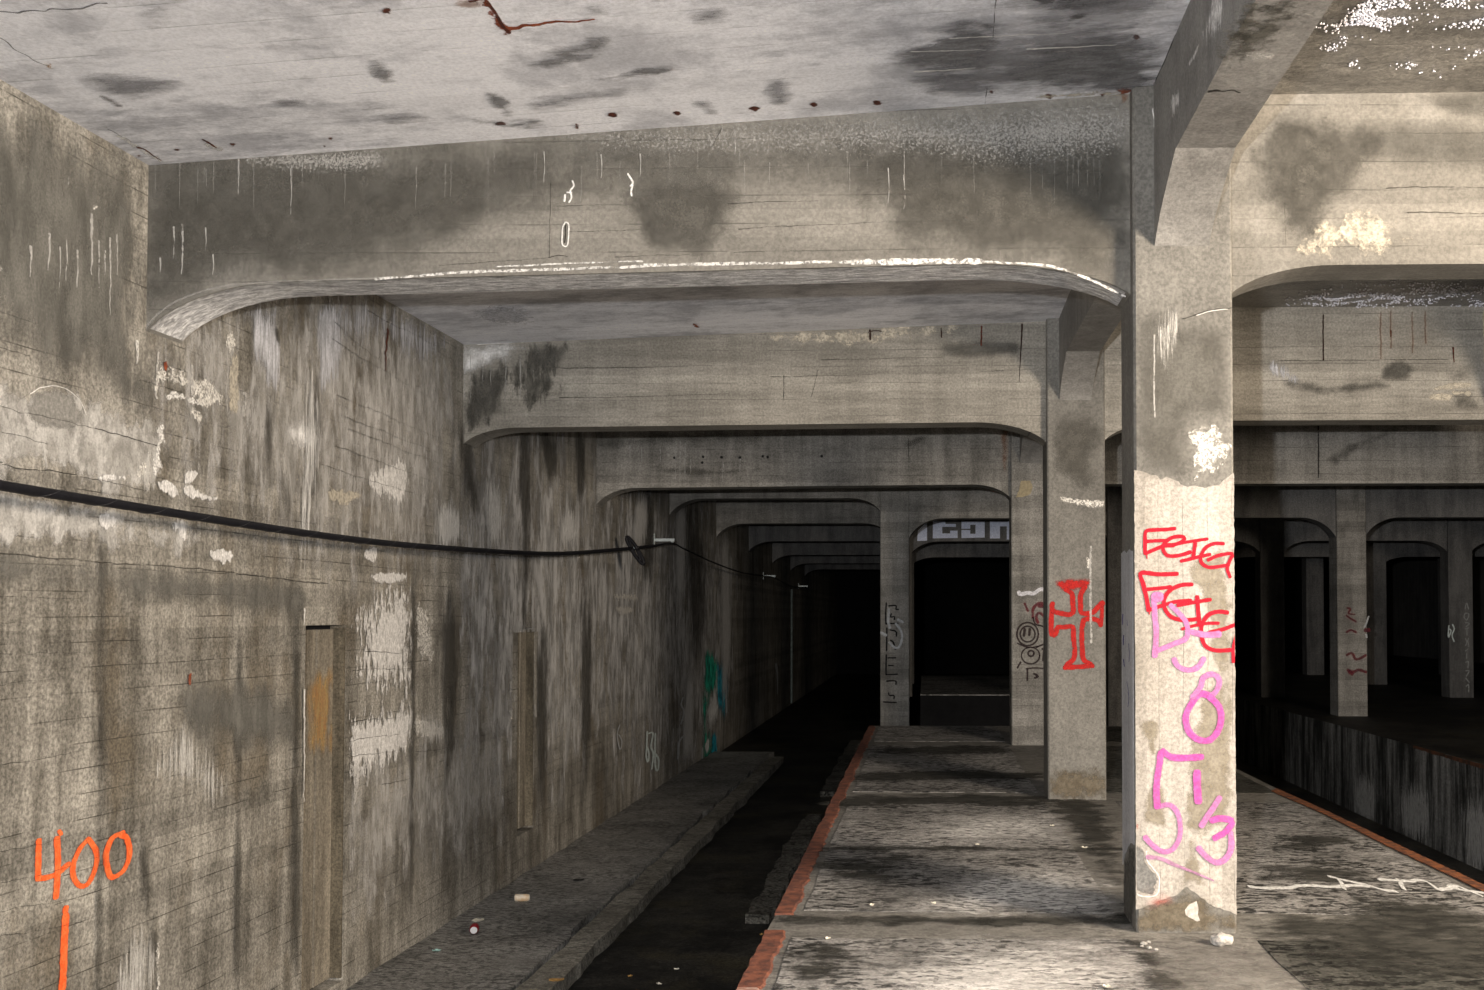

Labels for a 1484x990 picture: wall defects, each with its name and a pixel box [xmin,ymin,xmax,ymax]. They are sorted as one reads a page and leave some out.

leakage [93,78,169,107]
leakage [373,65,390,79]
leakage [904,0,1160,98]
leakage [573,144,736,247]
leakage [824,130,1115,251]
leakage [1264,125,1484,255]
leakage [0,123,552,424]
leakage [137,424,165,491]
leakage [267,304,445,569]
leakage [1143,318,1232,484]
leakage [435,342,741,794]
leakage [135,570,307,956]